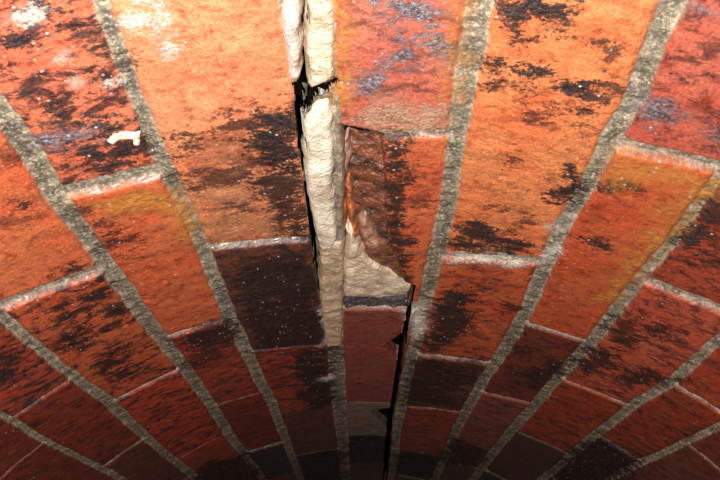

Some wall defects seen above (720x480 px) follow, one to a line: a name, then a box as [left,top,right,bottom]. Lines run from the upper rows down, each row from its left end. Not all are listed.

crack [288,46,339,293]
spalling [343,125,414,308]
crack [378,285,417,480]